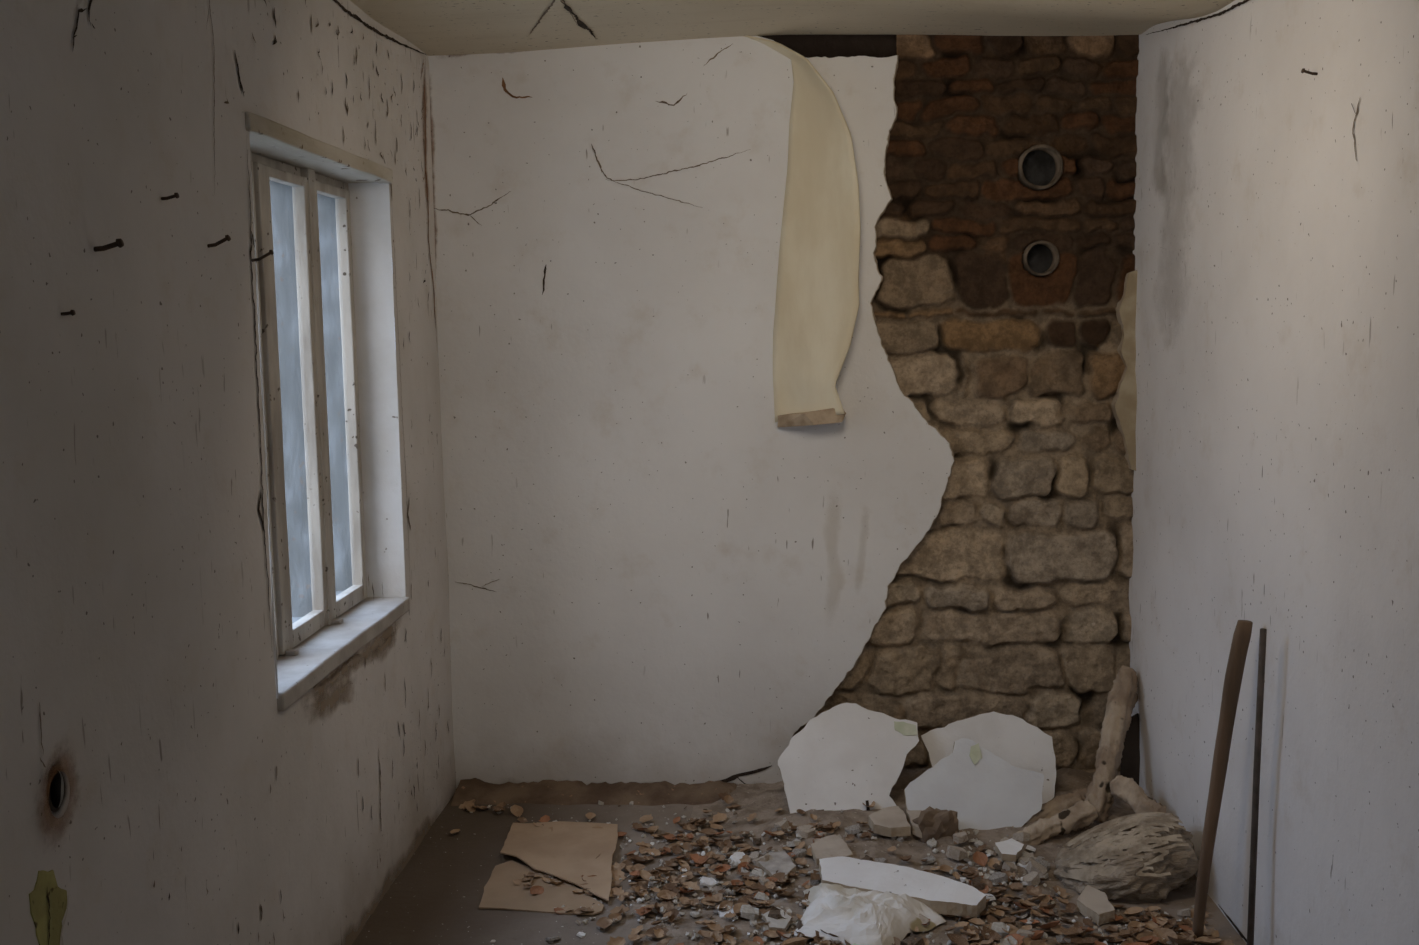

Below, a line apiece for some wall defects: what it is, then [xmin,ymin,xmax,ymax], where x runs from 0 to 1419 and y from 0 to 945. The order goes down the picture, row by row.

crack [530,0,595,37]
crack [1146,0,1249,35]
crack [502,78,530,99]
flaking render [744,35,1139,773]
water stain [313,625,407,715]
peeling [29,870,69,945]